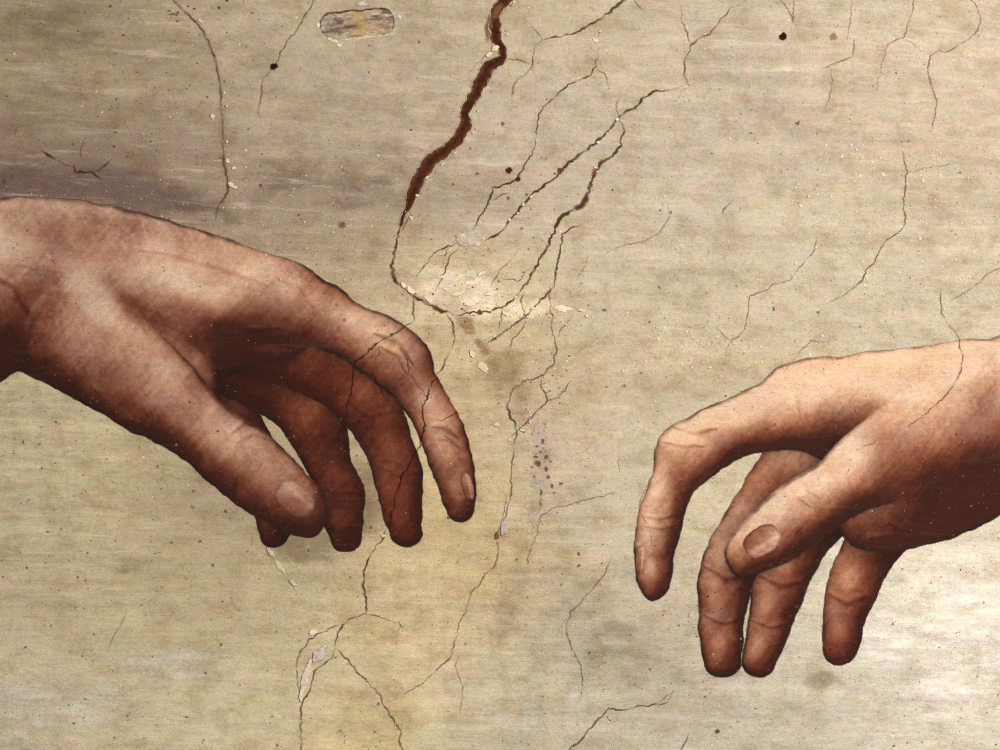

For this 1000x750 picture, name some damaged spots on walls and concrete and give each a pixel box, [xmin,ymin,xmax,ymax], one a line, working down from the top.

crack [174,1,238,210]
crack [682,10,729,74]
crack [885,0,981,123]
crack [859,161,908,283]
crack [721,241,817,338]
crack [297,0,667,750]